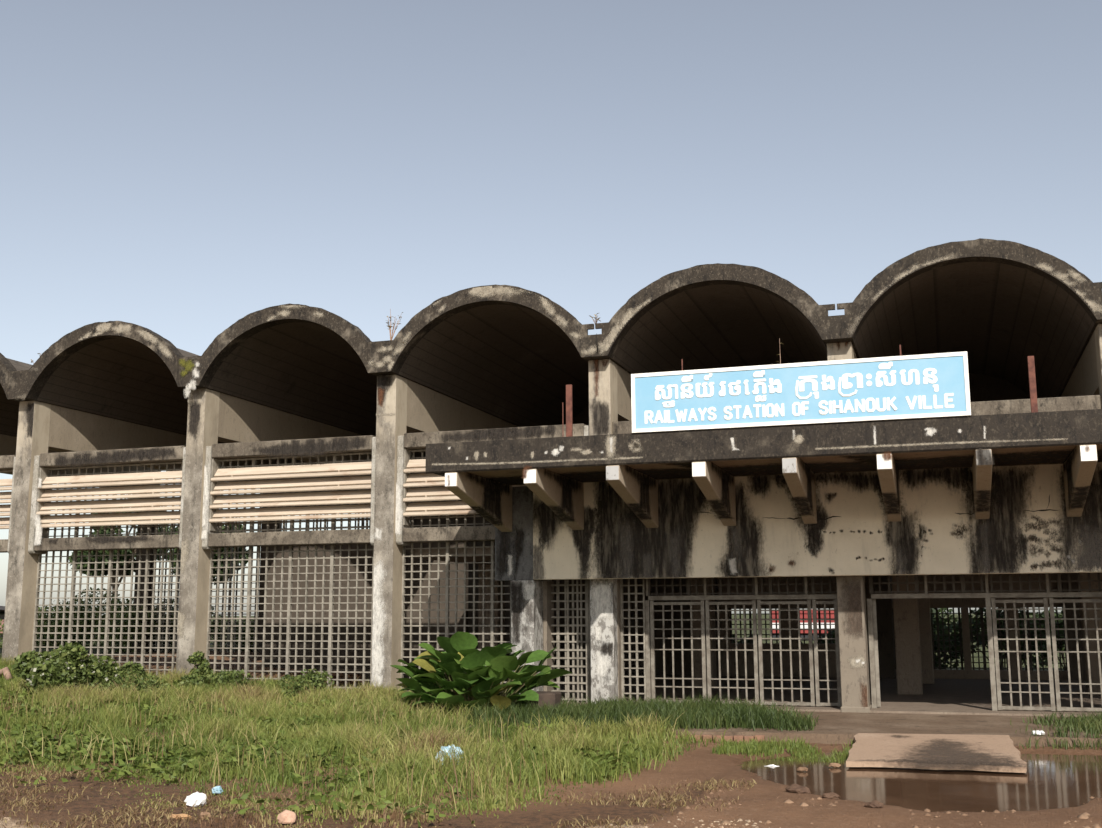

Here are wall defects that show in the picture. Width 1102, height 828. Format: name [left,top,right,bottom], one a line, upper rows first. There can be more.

leakage [432,425,1102,643]